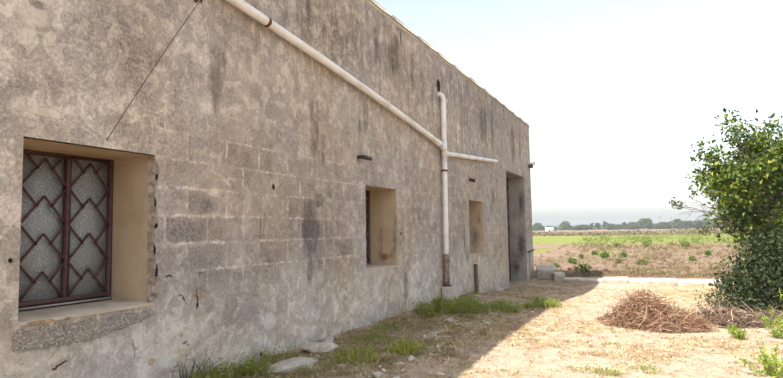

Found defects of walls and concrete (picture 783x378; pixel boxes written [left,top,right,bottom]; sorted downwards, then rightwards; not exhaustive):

peeling [12,156,162,353]